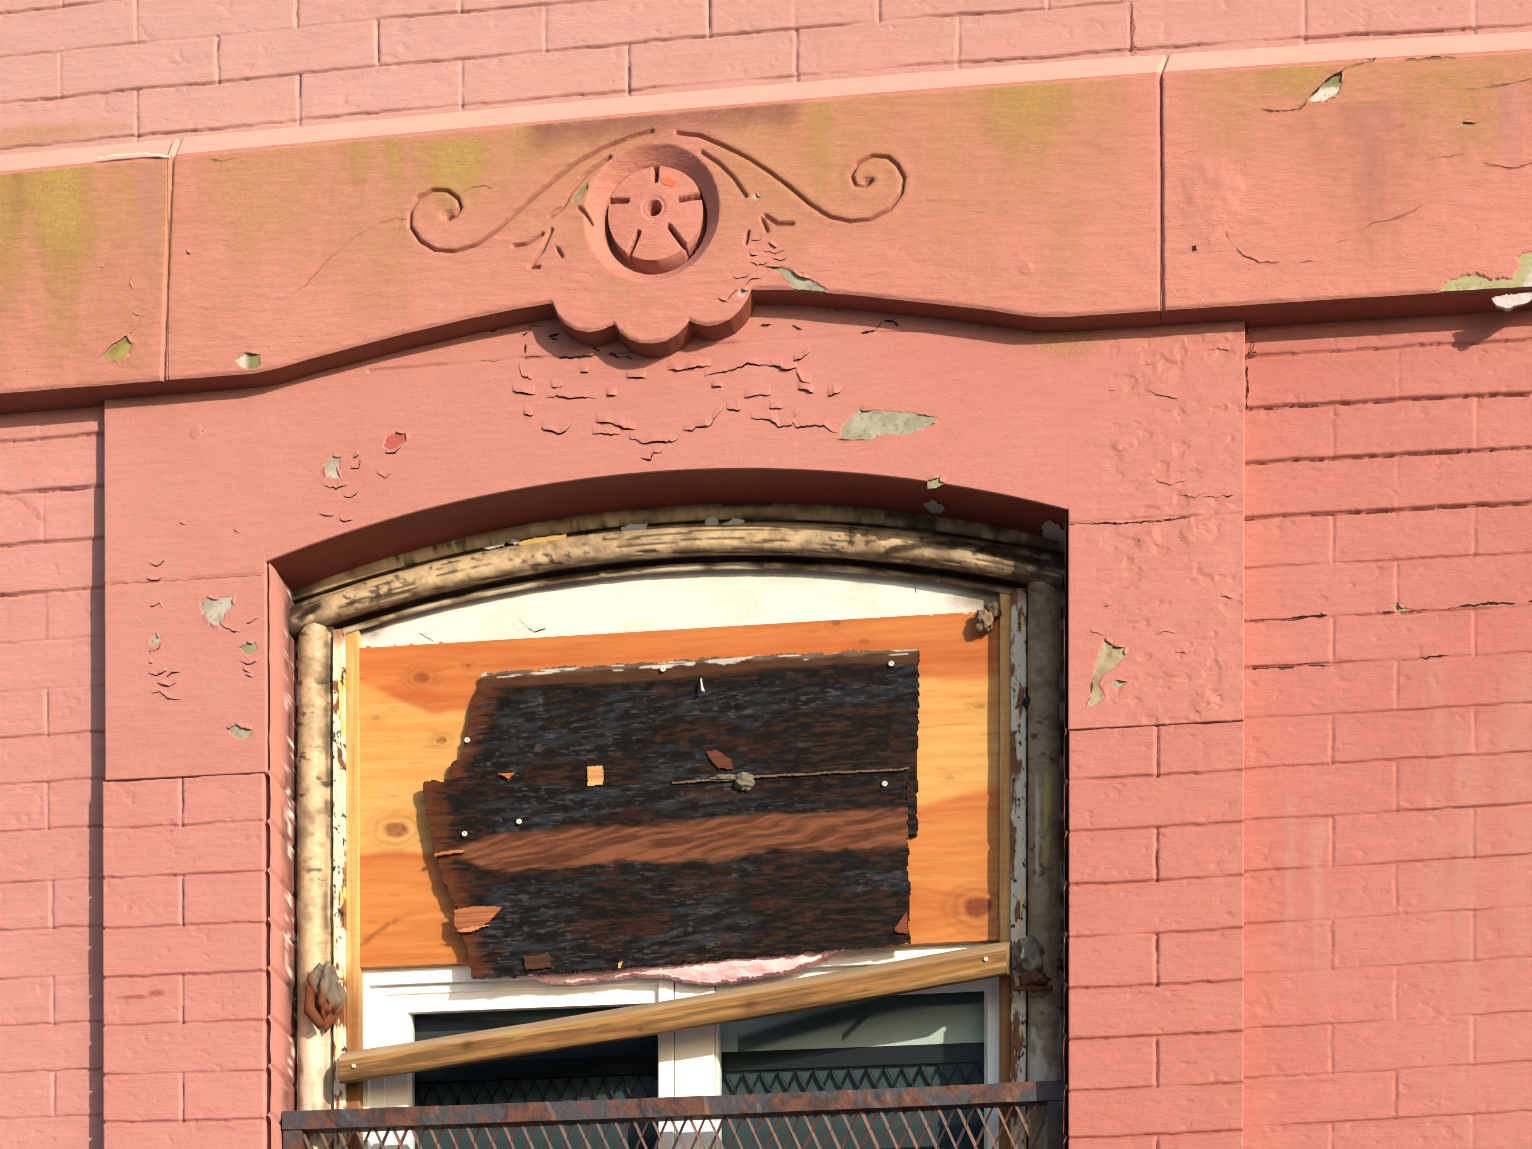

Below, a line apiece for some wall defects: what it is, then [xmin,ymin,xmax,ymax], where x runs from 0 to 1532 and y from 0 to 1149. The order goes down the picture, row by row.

crack [1121,0,1138,54]
crack [1262,56,1531,112]
crack [291,218,405,295]
spalling [1437,252,1532,312]
spalling [236,349,260,369]
peeling [512,343,946,461]
peeling [318,427,411,522]
peeling [200,593,259,678]
crack [1250,611,1328,621]
crack [1383,600,1532,613]
peeling [1085,624,1130,709]
peeling [223,718,254,739]